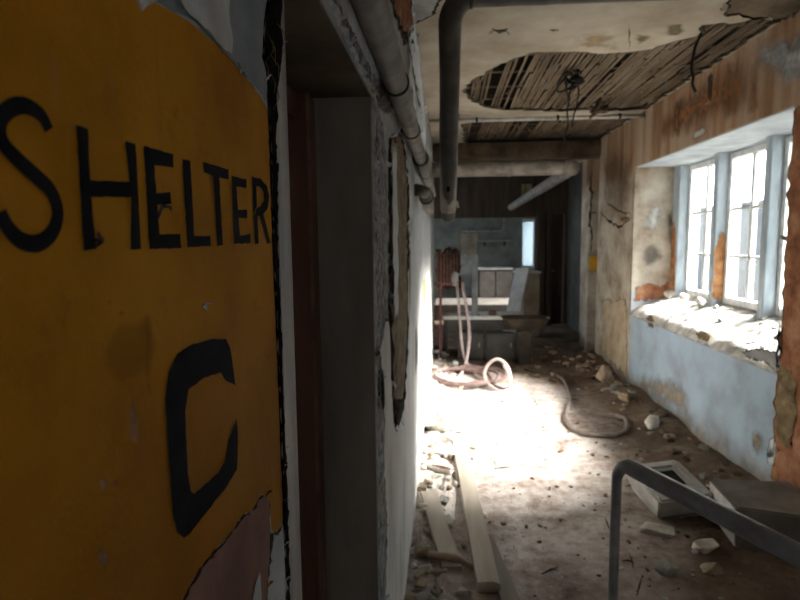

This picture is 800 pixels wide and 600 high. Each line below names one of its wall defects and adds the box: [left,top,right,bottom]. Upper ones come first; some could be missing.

peeling [136,0,272,103]
flaking render [759,35,800,81]
crack [588,170,635,259]
peeling [329,0,412,600]
peeling [600,281,670,379]
spalling [696,330,710,342]
spalling [743,106,800,490]
peeling [183,490,289,600]